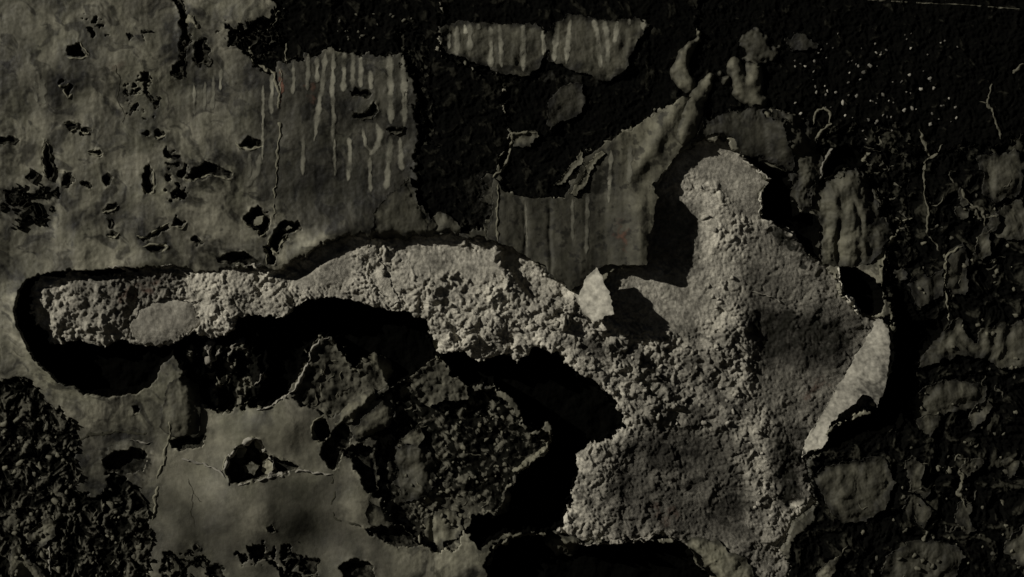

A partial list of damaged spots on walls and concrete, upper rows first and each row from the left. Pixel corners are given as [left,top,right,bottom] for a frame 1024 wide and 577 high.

peeling [67,16,107,60]
peeling [170,0,212,78]
leakage [448,20,646,87]
peeling [124,72,233,202]
leakage [246,78,274,187]
leakage [291,53,408,191]
peeling [224,0,1024,343]
spalling [0,96,896,577]
crack [78,422,361,527]
peeling [785,355,1024,577]